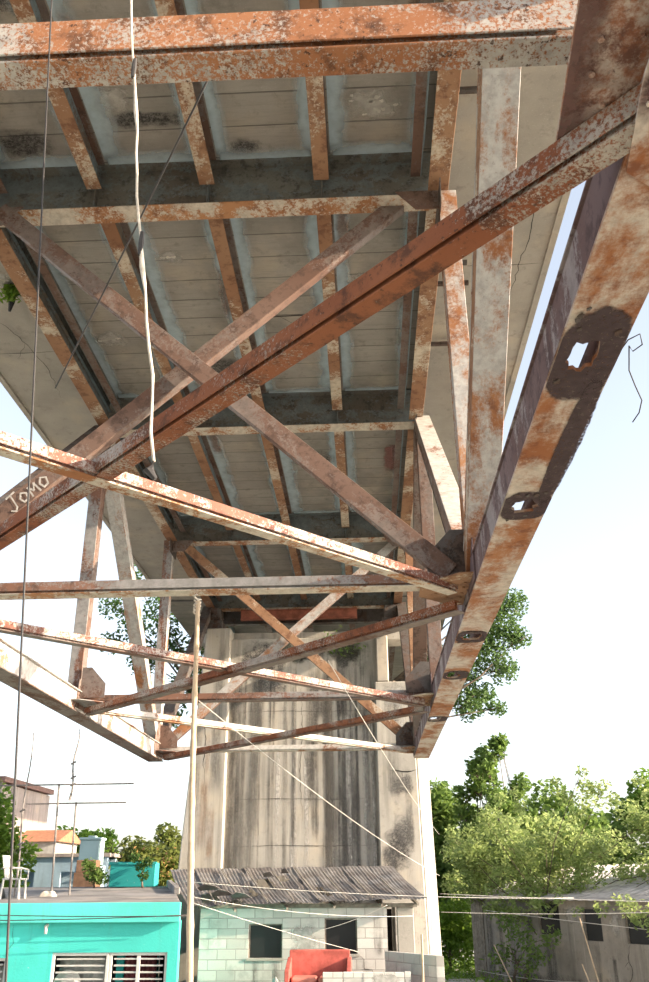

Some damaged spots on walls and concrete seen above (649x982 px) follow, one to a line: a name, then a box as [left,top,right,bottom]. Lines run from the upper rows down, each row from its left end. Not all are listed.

water stain [0,132,44,157]
water stain [212,681,275,869]
water stain [268,742,280,824]
water stain [283,676,413,868]